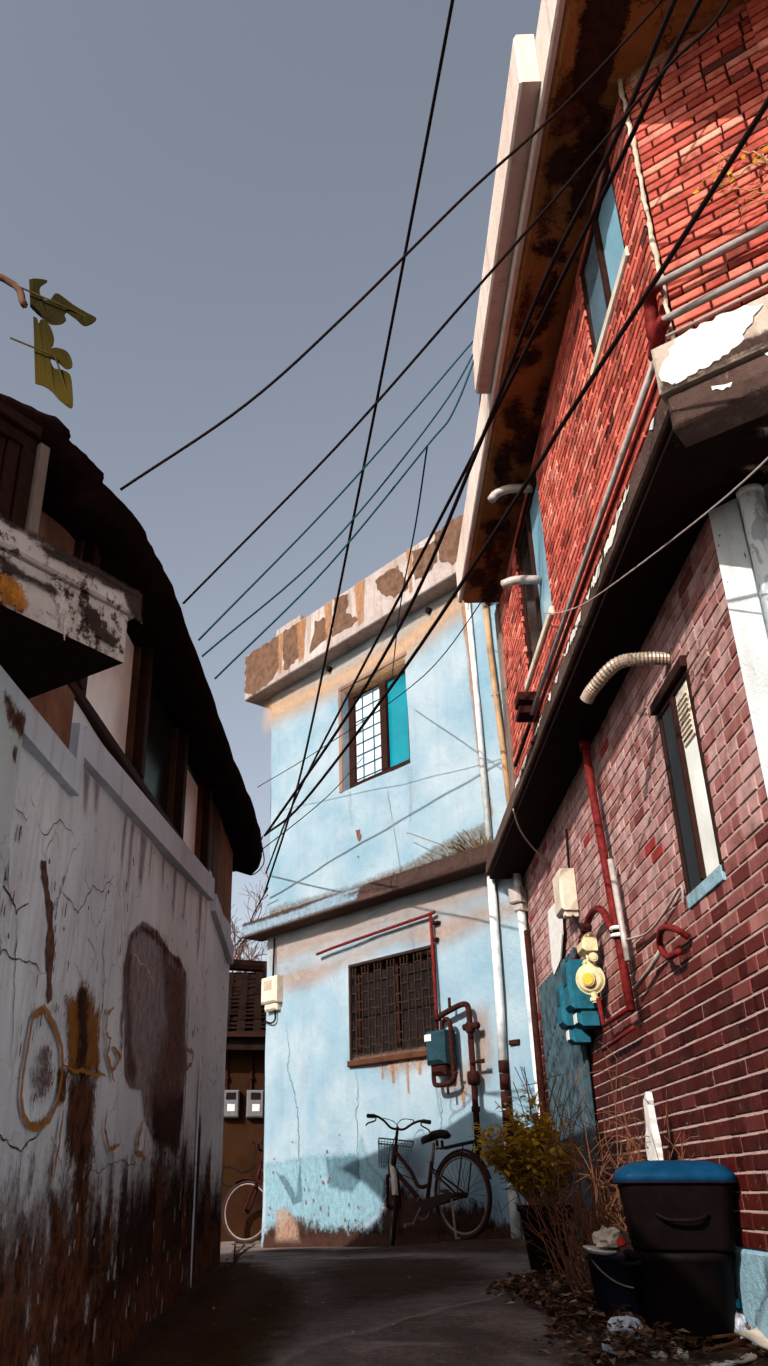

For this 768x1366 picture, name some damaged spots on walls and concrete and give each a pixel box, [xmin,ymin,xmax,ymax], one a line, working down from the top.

damp [269,67,614,763]
peeling [659,304,762,384]
corrosion [0,573,31,611]
peeling [0,558,118,647]
peeling [0,514,143,623]
peeling [244,515,463,695]
crack [0,793,123,1067]
crack [0,1126,137,1216]
corrosion [49,981,101,1244]
damp [0,945,222,1366]